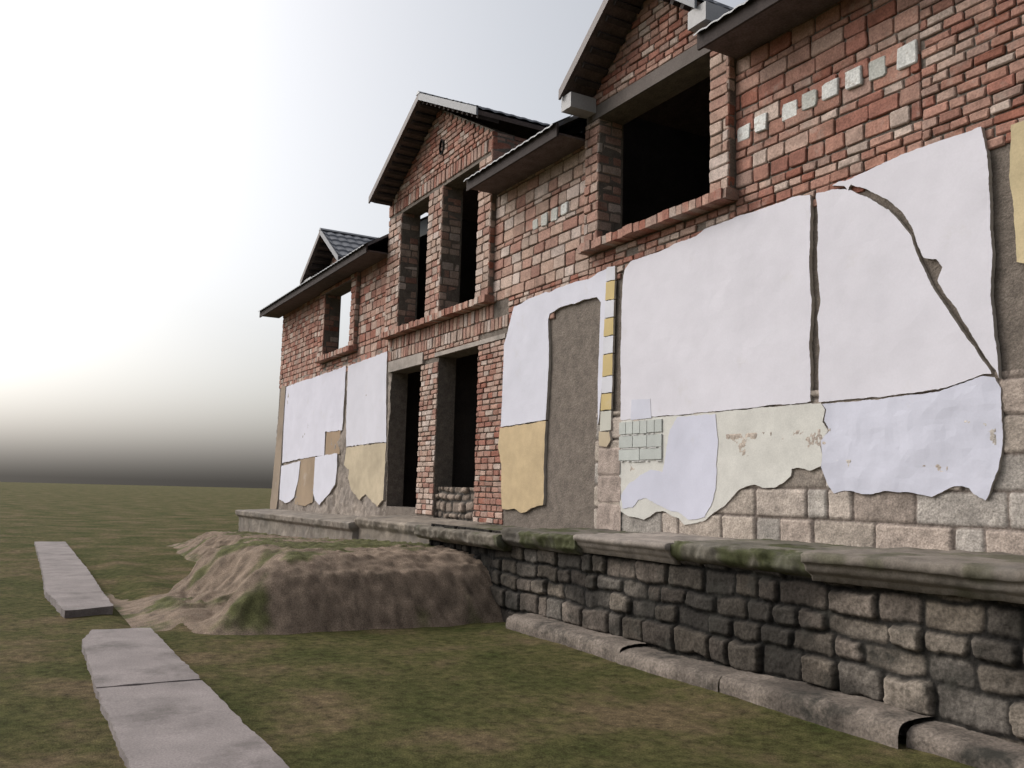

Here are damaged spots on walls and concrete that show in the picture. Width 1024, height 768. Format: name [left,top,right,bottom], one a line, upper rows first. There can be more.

flaking render [295,430,341,506]